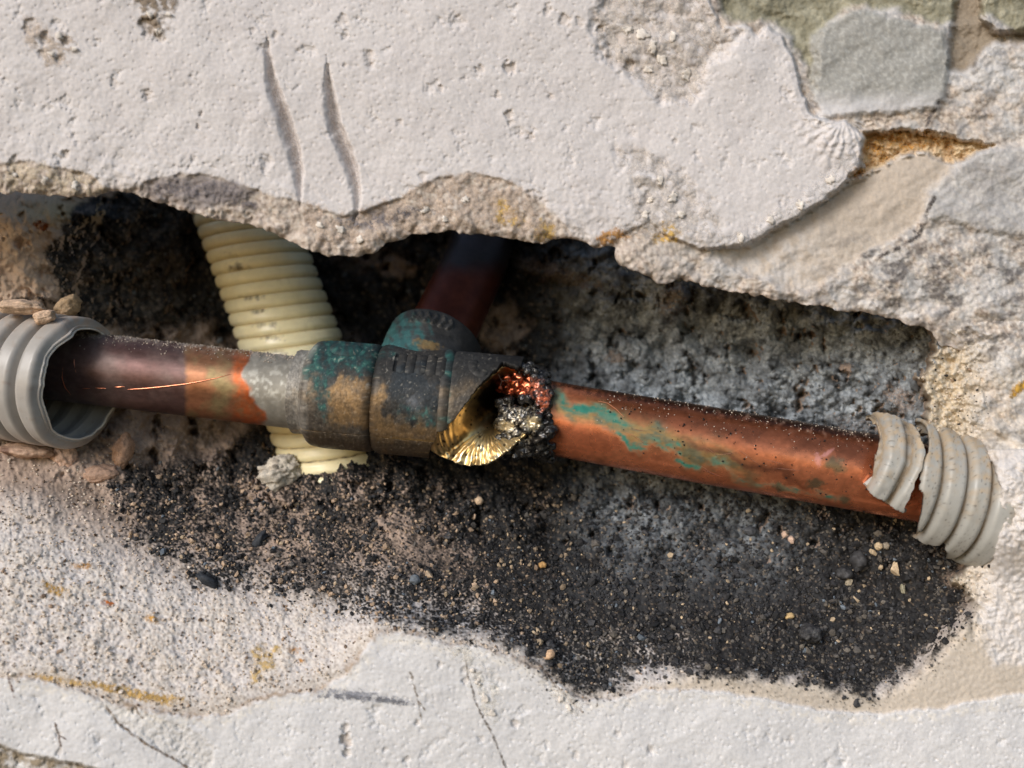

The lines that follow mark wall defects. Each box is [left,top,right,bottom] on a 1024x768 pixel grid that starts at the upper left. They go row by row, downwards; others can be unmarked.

spalling [596,0,733,103]
spalling [0,164,107,196]
spalling [304,174,543,254]
spalling [619,151,865,250]
spalling [891,561,905,594]
leakage [324,689,407,705]